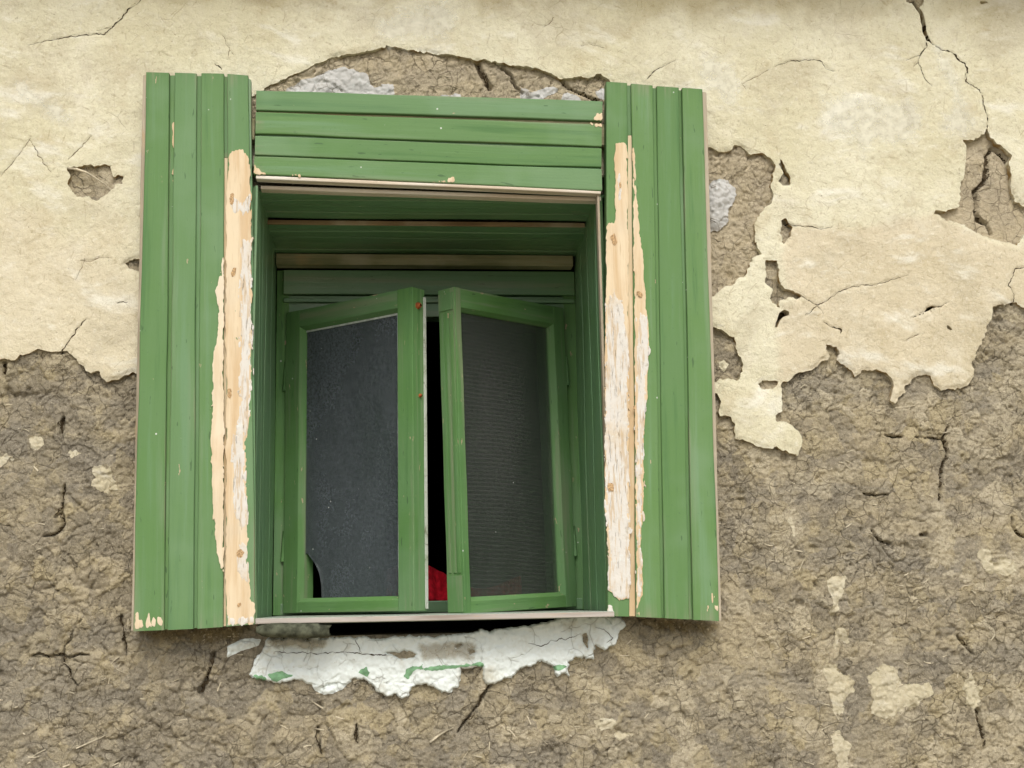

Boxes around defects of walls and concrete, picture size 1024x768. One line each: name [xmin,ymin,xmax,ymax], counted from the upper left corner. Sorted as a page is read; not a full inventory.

crack [30,0,141,45]
flaking render [252,47,608,127]
crack [908,25,1005,229]
flaking render [708,146,799,313]
flaking render [934,134,1024,245]
peeling [210,149,256,626]
peeling [604,142,651,608]
crack [44,487,66,537]
flaking render [0,303,1024,768]
crack [886,427,949,501]
crack [200,654,215,692]
crack [458,685,490,729]